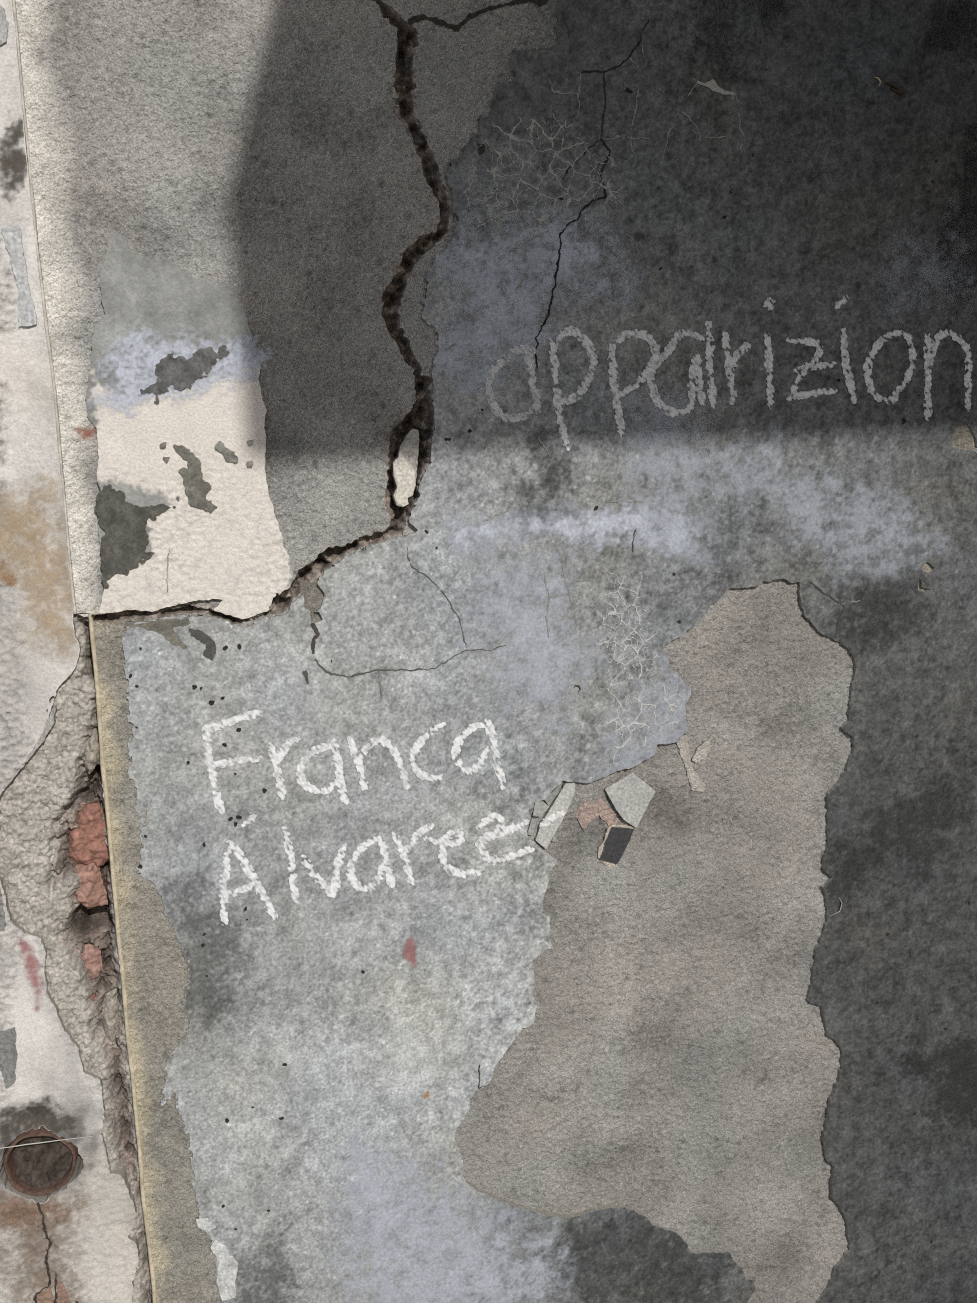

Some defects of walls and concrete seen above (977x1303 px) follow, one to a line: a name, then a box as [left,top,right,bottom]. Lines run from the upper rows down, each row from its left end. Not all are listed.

peeling [0,0,558,660]
crack [74,0,745,699]
flaking render [0,1027,18,1089]
flaking render [0,705,57,797]
crack [33,1203,78,1303]
peeling [455,579,854,1303]